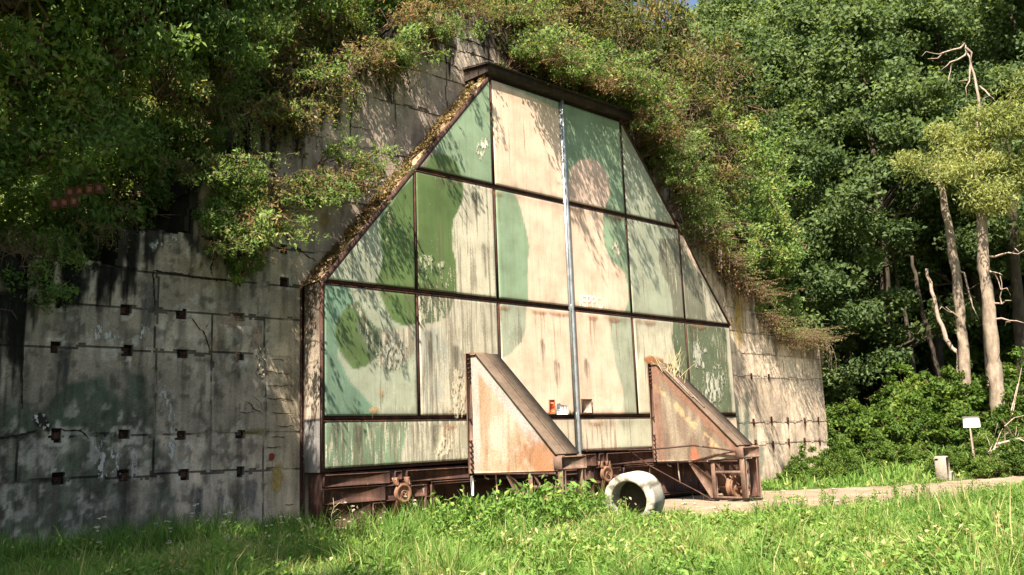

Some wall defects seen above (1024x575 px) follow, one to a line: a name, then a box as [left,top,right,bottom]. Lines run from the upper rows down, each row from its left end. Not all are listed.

leakage [0,235,133,367]
crack [192,317,213,351]
peeling [693,340,725,403]
spalling [33,413,50,431]
peeling [94,440,119,478]